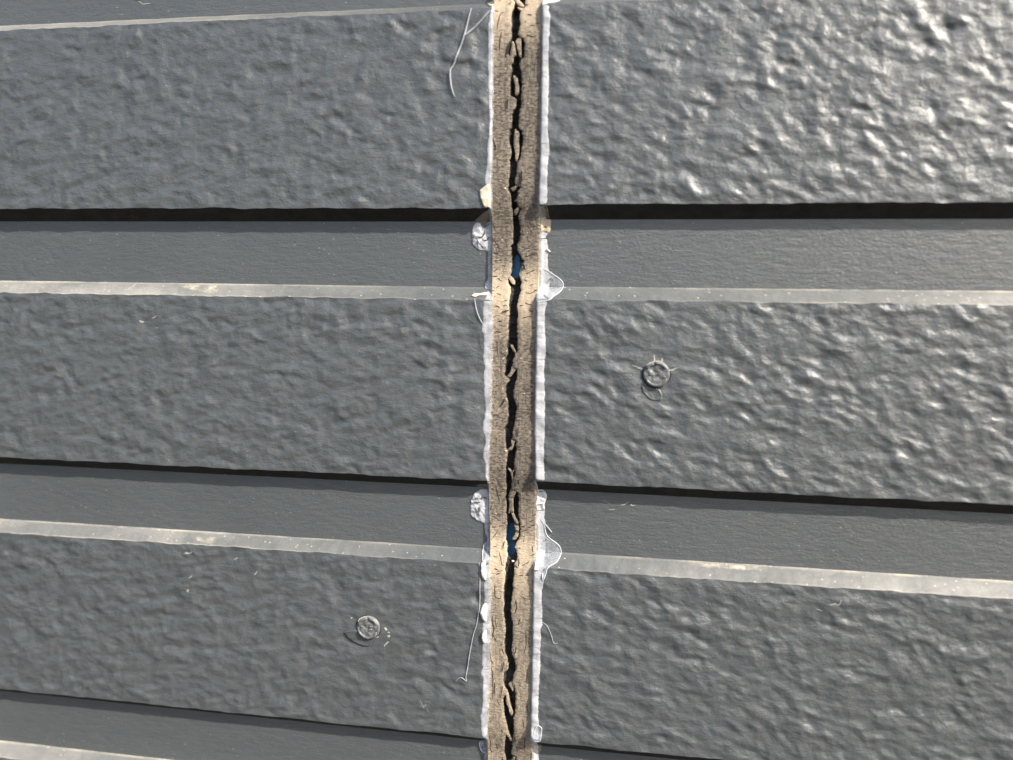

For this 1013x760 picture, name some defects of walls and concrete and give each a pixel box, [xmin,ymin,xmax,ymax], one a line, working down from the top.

crack [472,0,562,760]